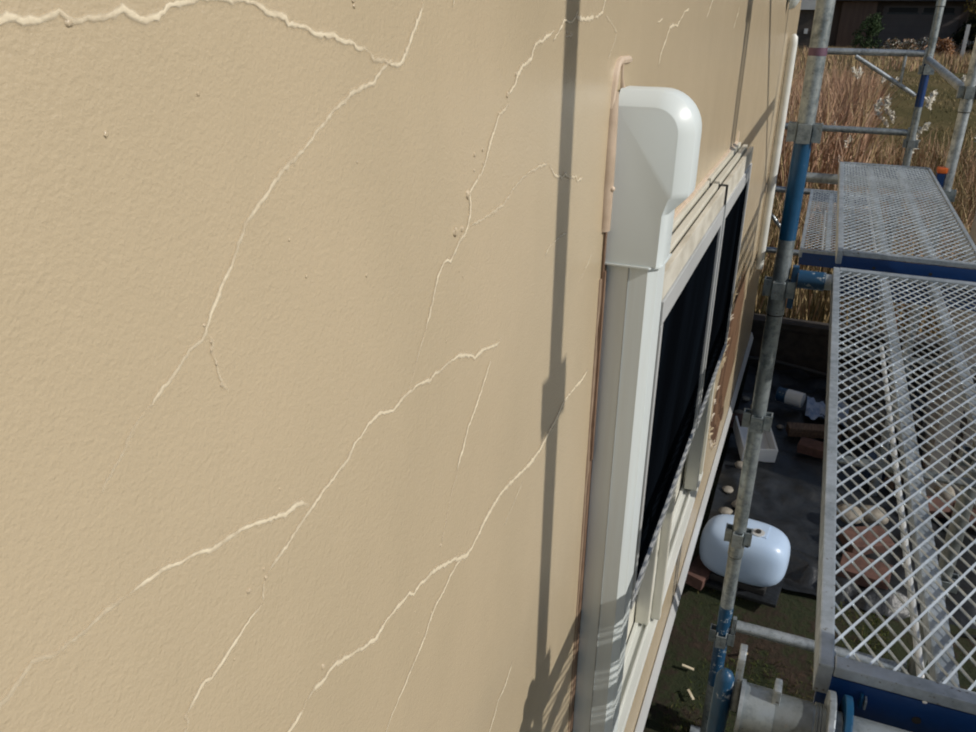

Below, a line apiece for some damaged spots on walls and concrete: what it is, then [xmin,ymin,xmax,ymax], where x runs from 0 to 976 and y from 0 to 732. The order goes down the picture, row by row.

crack [0,0,423,405]
crack [0,341,500,732]
crack [288,371,587,732]
crack [420,0,616,350]
peeling [708,274,745,450]